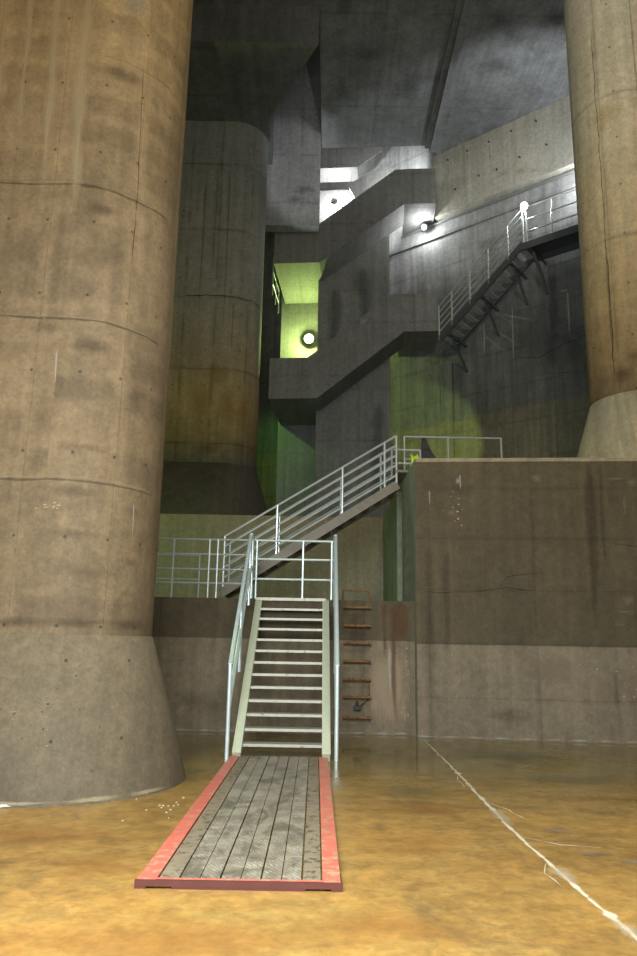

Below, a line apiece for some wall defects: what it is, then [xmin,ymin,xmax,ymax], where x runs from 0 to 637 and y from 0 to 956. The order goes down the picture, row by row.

crack [423,739,637,940]